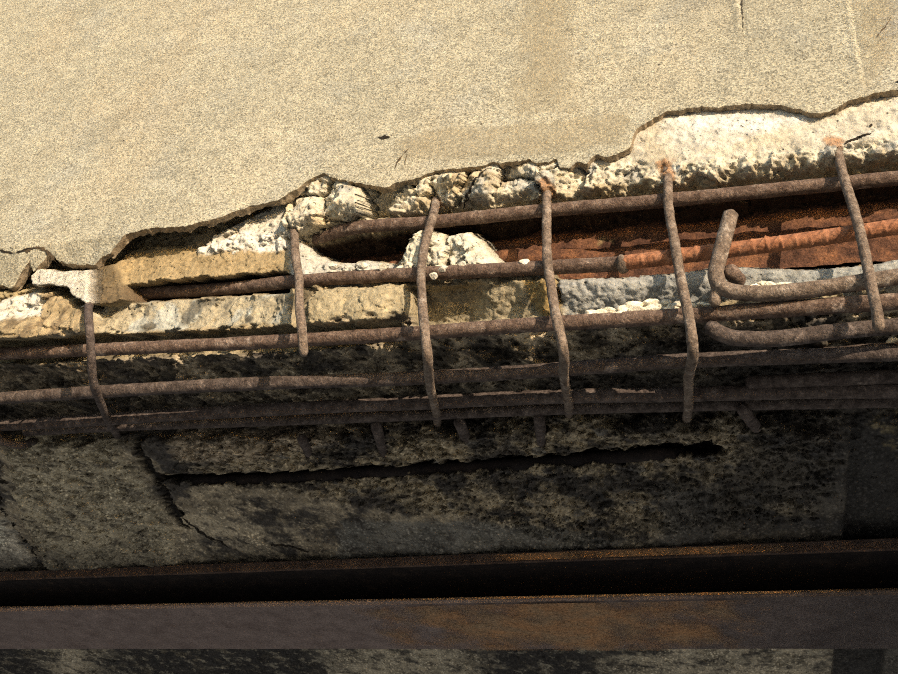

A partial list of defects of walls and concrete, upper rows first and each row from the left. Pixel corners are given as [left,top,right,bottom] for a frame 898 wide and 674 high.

corrosion [539,179,556,198]
corrosion [657,159,675,181]
spalling [0,81,898,550]
crack [128,431,228,548]
corrosion [501,545,761,560]
corrosion [396,591,794,650]